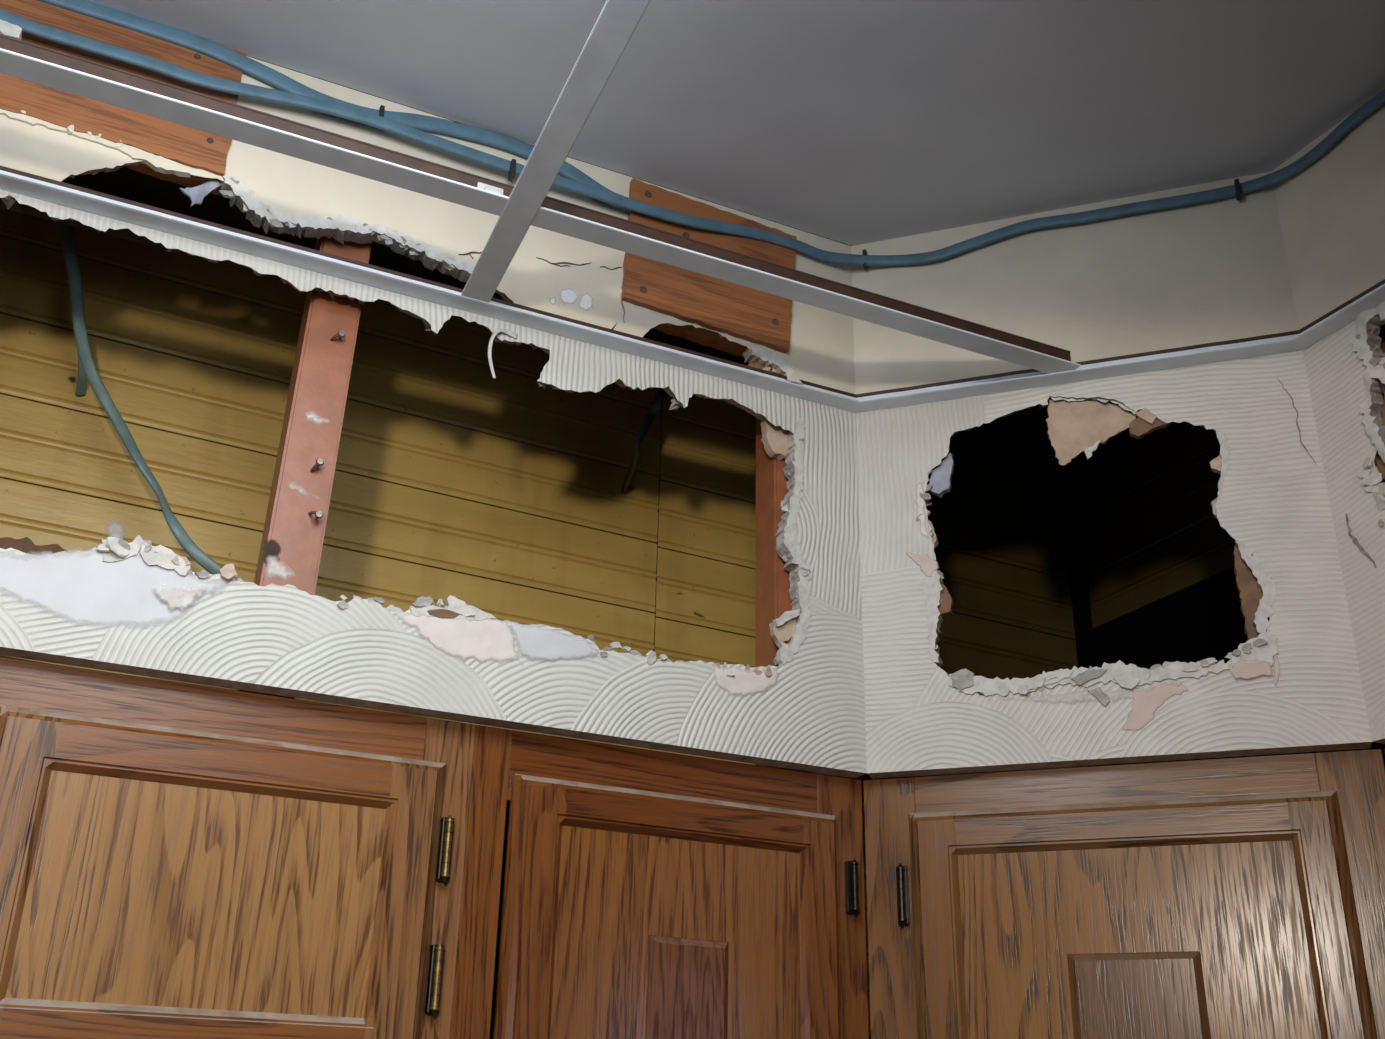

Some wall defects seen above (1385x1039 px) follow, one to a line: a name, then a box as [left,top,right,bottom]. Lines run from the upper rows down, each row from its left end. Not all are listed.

spalling [219,176,475,282]
peeling [1356,301,1385,339]
spalling [743,346,803,396]
peeling [1361,457,1385,528]
spalling [0,535,244,627]
spalling [337,595,668,665]
spalling [714,418,812,696]
spalling [907,453,1280,731]